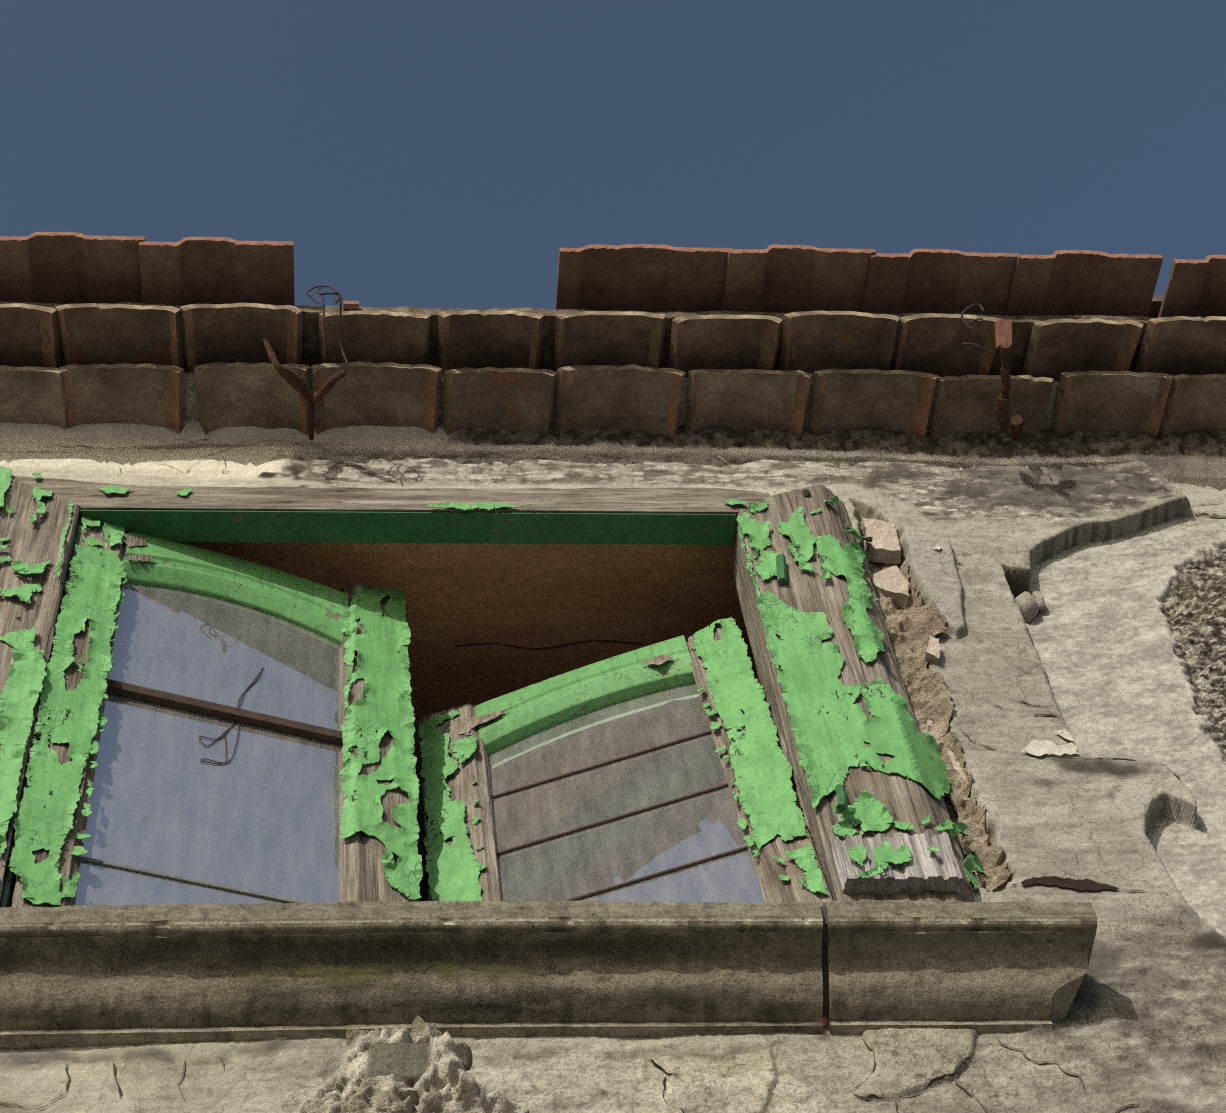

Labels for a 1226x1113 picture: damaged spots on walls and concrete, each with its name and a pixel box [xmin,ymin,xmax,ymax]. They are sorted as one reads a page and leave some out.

peeling [0,465,13,514]
peeling [428,501,532,511]
peeling [0,500,155,905]
peeling [688,493,1012,896]
peeling [339,586,508,901]
flaking render [1020,729,1079,756]
crack [0,1064,70,1109]
crack [113,1062,122,1098]
crack [177,1060,186,1100]
crack [646,1059,685,1113]
crack [852,1034,988,1113]
crack [995,1036,1085,1091]